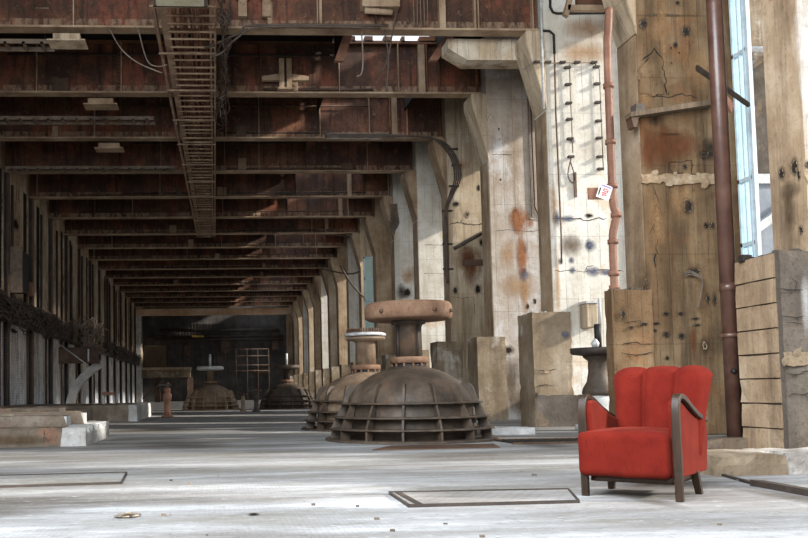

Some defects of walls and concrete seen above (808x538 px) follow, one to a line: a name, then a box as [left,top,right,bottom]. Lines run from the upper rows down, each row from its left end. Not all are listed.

crack [641,48,697,98]
spalling [779,160,808,184]
corrosion [506,210,533,270]
peeling [782,347,808,367]